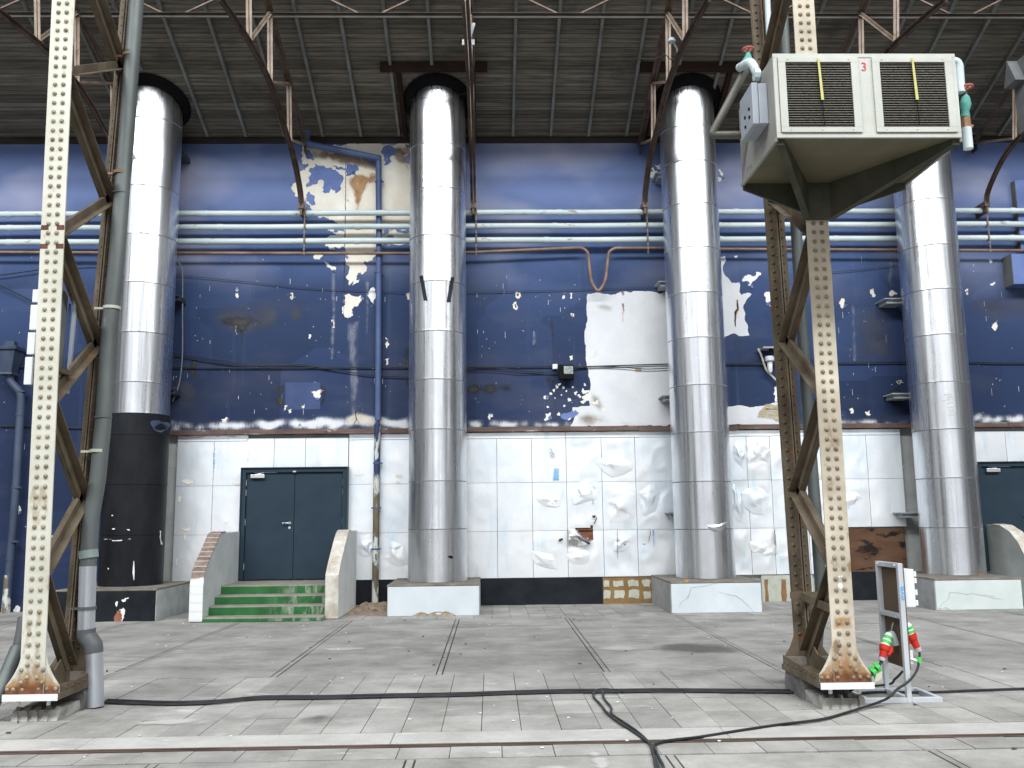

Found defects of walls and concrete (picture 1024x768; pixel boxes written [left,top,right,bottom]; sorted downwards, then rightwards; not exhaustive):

corrosion [350,175,375,202]
peeling [290,143,410,328]
peeling [742,272,771,307]
water stain [347,414,373,424]
corrosion [820,654,871,682]
corrosion [5,673,59,694]